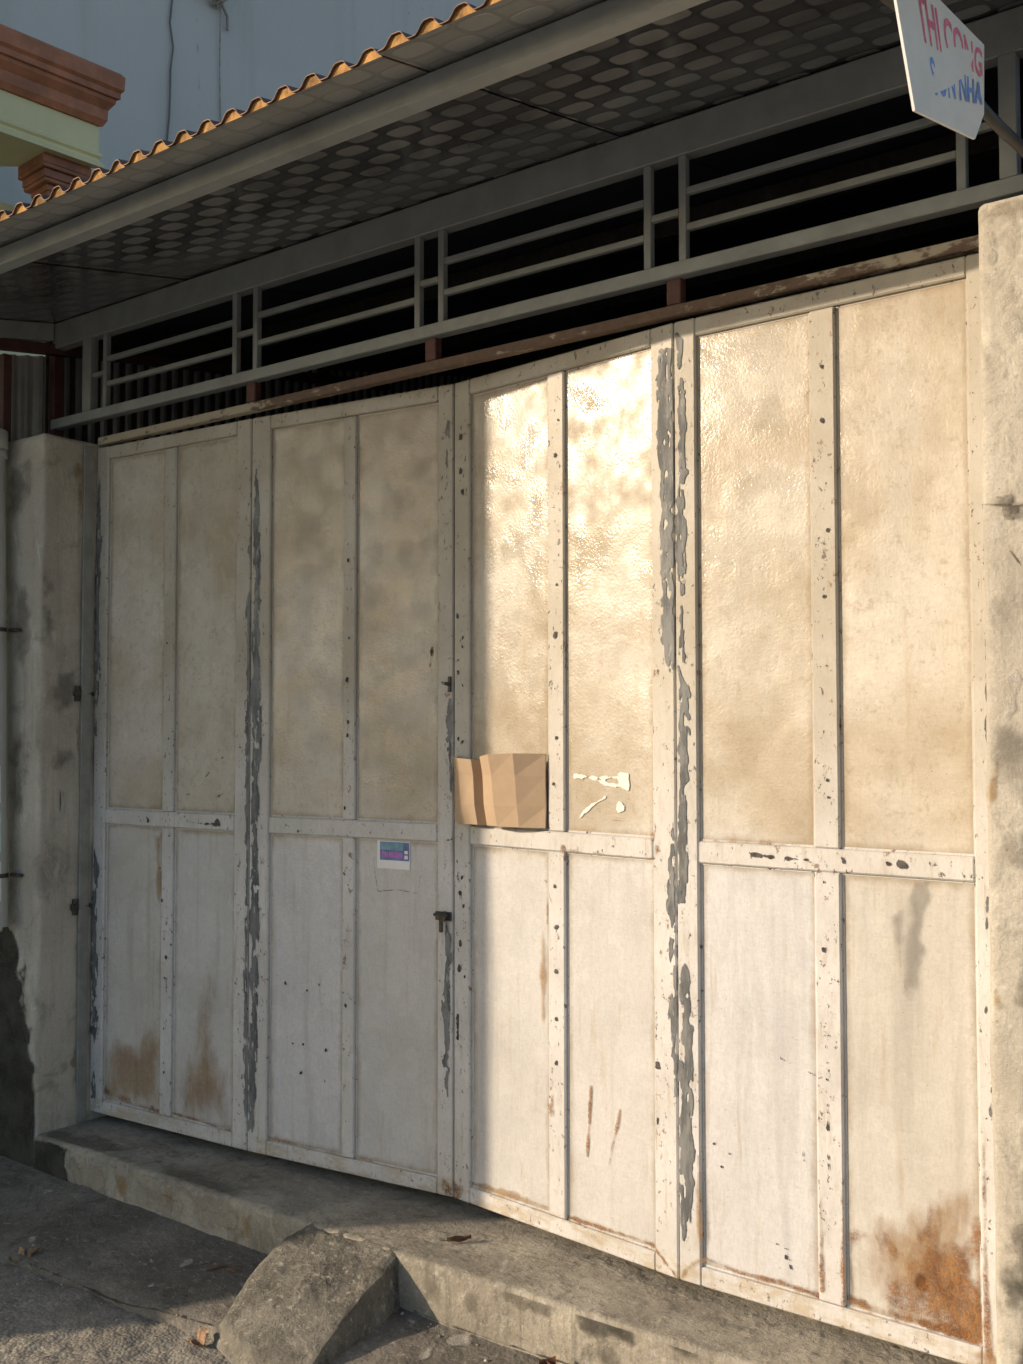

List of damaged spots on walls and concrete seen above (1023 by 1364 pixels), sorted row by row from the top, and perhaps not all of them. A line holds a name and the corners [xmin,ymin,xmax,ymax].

peeling [242,458,262,1132]
peeling [655,332,695,1241]
corrosion [889,1216,996,1364]